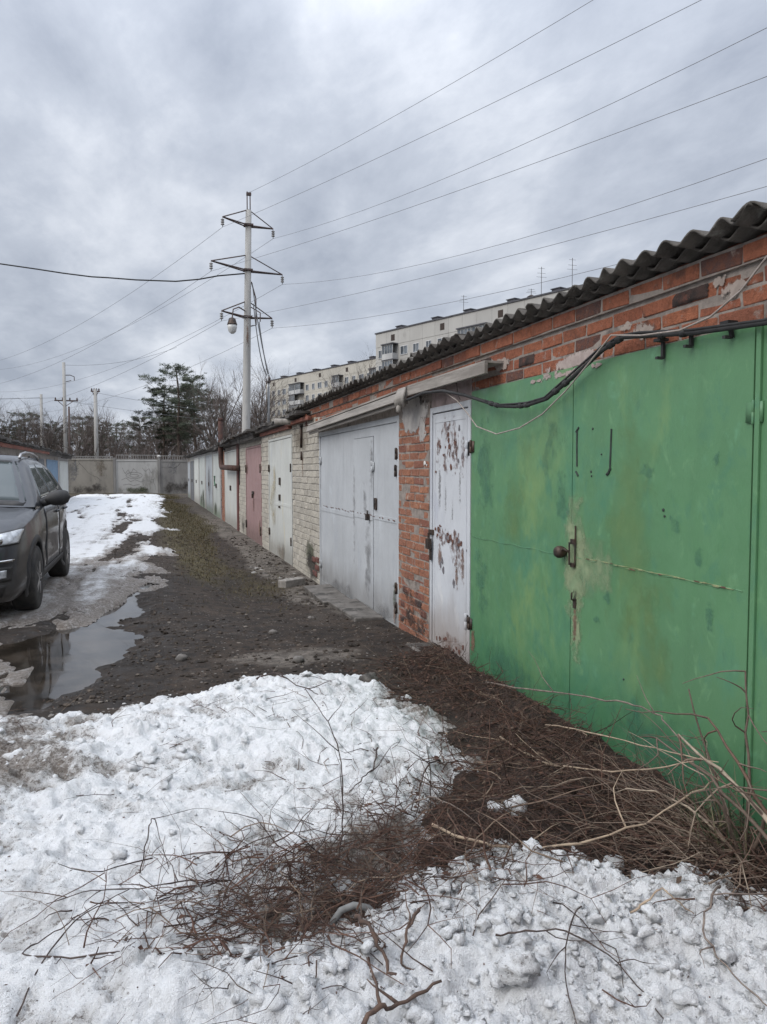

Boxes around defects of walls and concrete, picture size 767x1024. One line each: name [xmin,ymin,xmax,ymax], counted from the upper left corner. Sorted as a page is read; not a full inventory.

spalling [672,283,709,308]
flaking render [530,348,604,384]
corrosion [435,417,465,474]
corrosion [435,525,467,588]